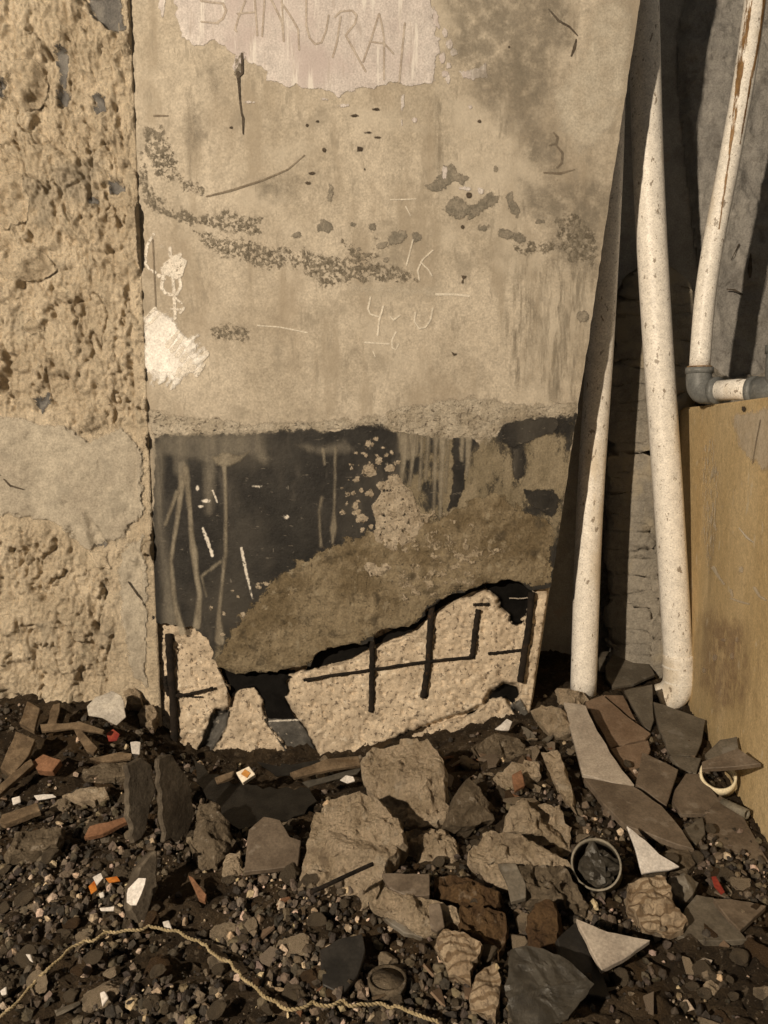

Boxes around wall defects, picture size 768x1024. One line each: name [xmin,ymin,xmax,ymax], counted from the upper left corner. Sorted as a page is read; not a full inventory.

water stain [513,214,597,267]
flaking render [148,395,577,441]
water stain [164,466,221,629]
water stain [339,433,506,602]
spalling [163,633,213,742]
spalling [303,592,535,713]